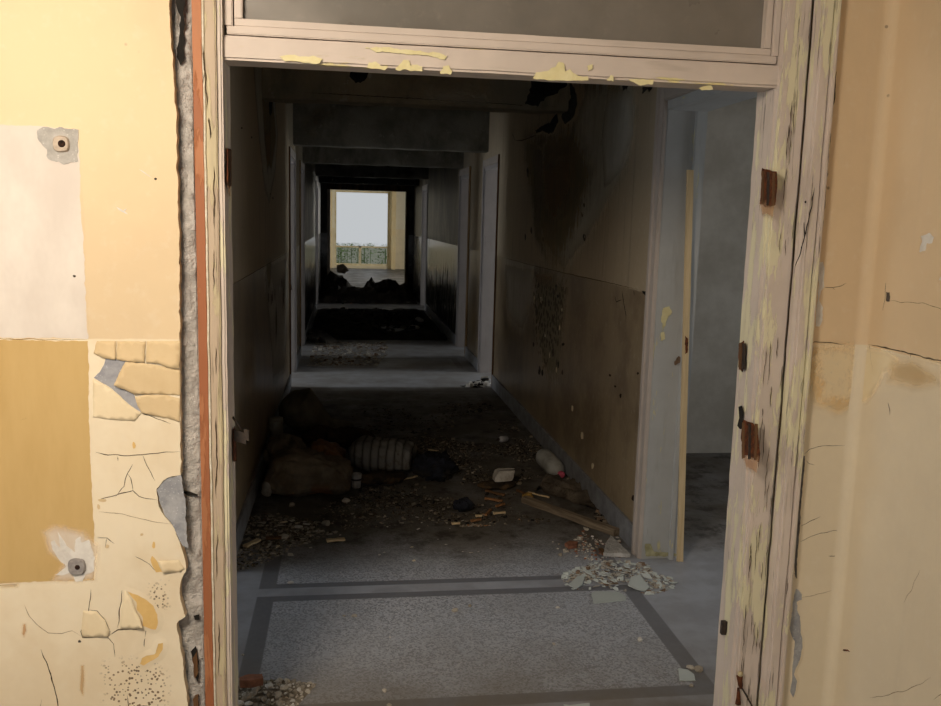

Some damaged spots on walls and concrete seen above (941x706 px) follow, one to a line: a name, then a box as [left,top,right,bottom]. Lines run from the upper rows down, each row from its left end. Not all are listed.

peeling [346,47,452,85]
spalling [522,62,593,136]
peeling [607,75,654,92]
peeling [0,0,205,706]
crack [97,451,181,524]
flaking render [788,453,807,700]
crack [25,593,146,706]